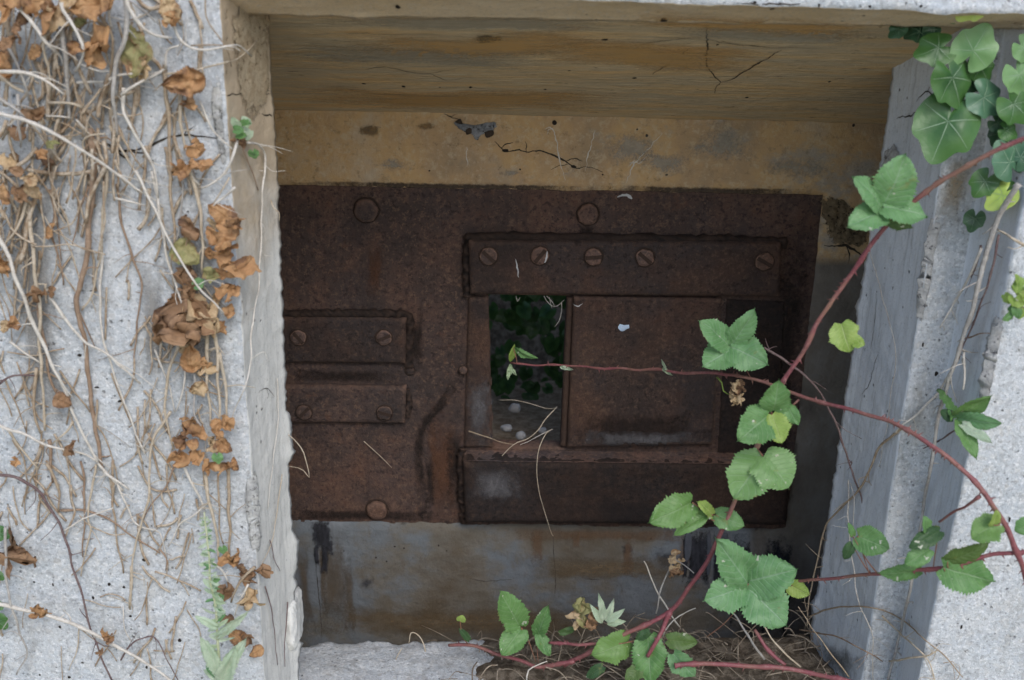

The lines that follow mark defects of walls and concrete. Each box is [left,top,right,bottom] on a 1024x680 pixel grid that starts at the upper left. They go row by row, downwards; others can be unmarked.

crack [631,27,799,91]
spalling [454,119,497,140]
crack [496,142,602,172]
spalling [820,196,869,247]
rust [763,253,807,390]
rust [415,396,446,500]
rust [589,416,688,444]
rust [306,499,425,520]
damp [314,546,328,574]
rust [301,563,309,605]